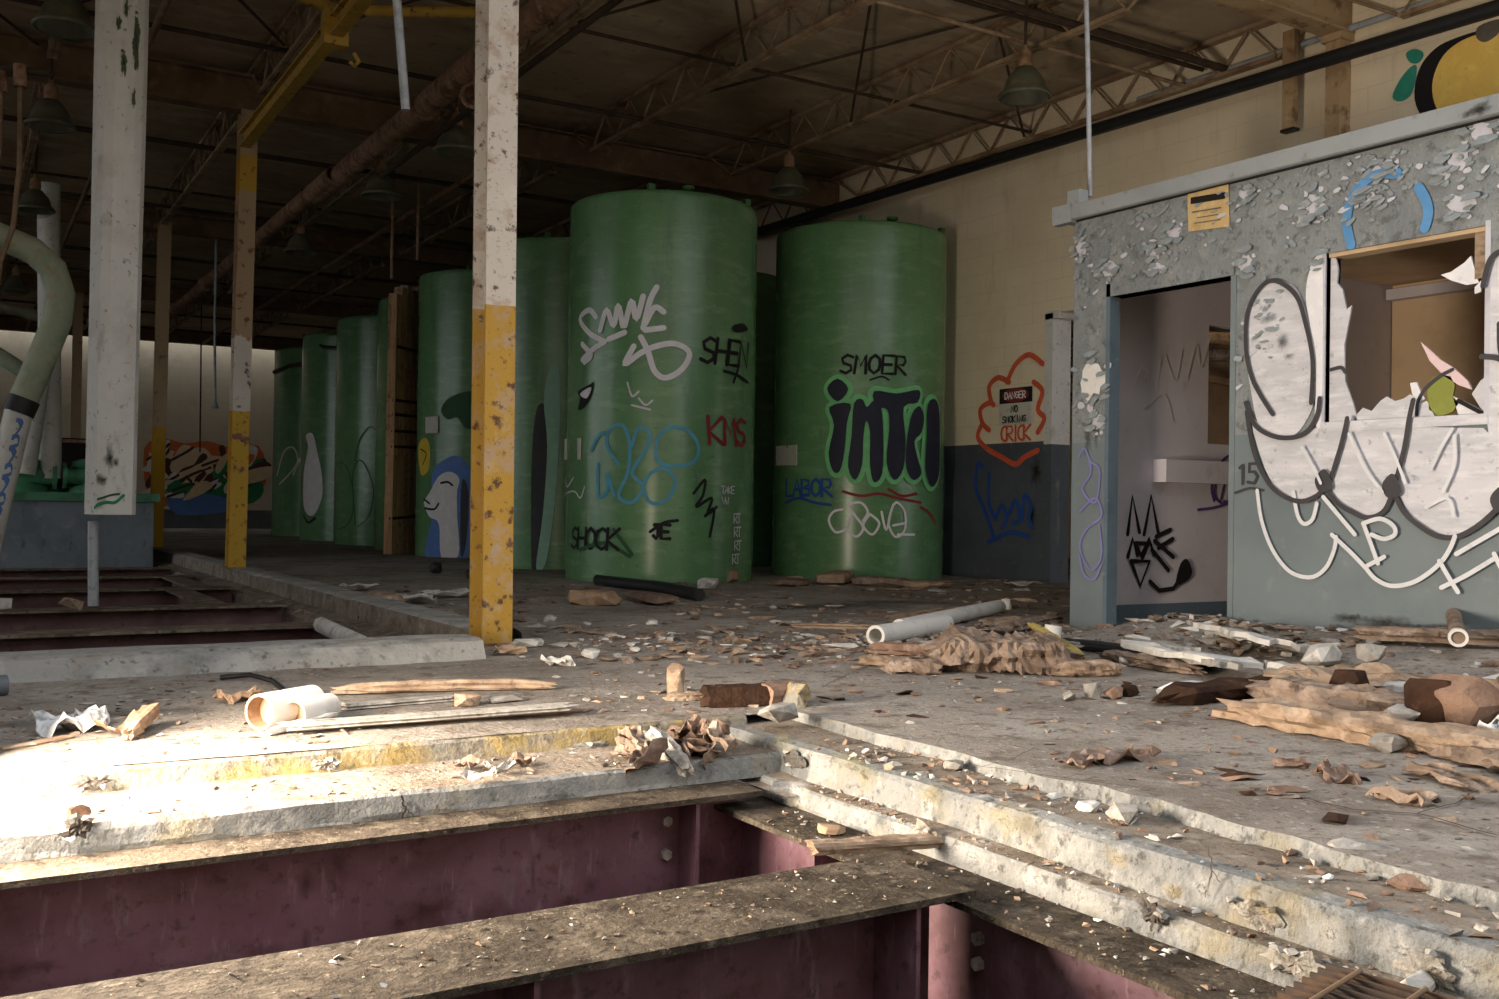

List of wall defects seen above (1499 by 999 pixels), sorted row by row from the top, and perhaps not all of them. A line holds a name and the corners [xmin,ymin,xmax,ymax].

peeling [1068,121,1499,308]
peeling [1231,244,1285,403]